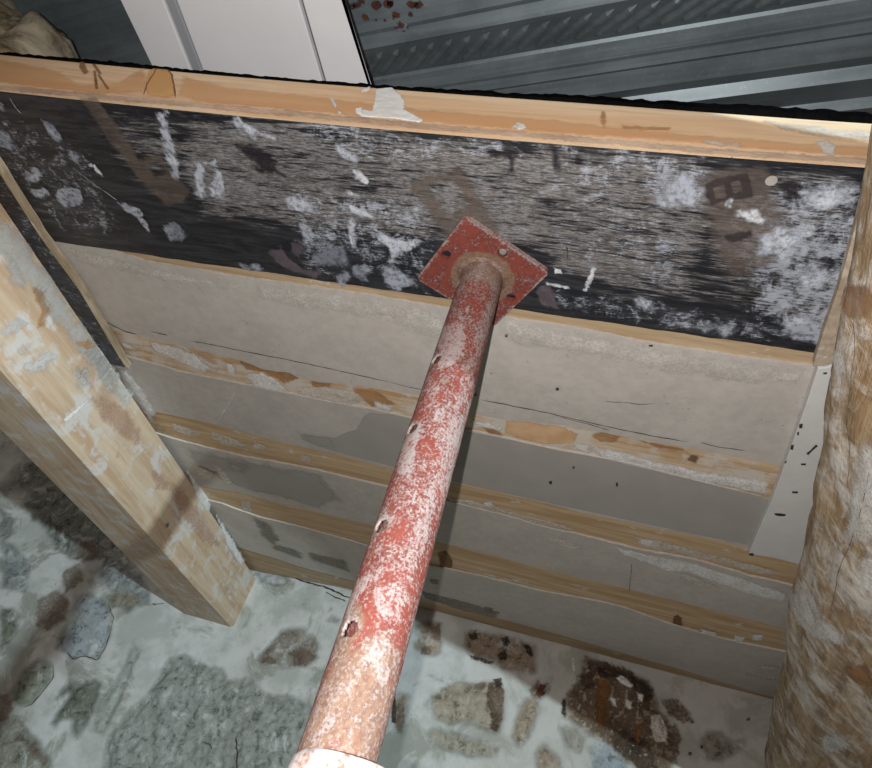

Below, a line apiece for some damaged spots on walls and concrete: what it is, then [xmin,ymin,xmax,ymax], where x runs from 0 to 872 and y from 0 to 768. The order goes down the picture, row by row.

rust [349,0,423,32]
water stain [336,145,368,184]
water stain [789,185,855,210]
water stain [349,205,373,218]
water stain [378,234,418,290]
water stain [542,268,569,293]
peeling [226,361,298,383]
peeling [355,389,392,412]
peeling [474,421,577,444]
peeling [643,441,698,462]
rust [392,693,404,729]
rust [475,678,504,731]